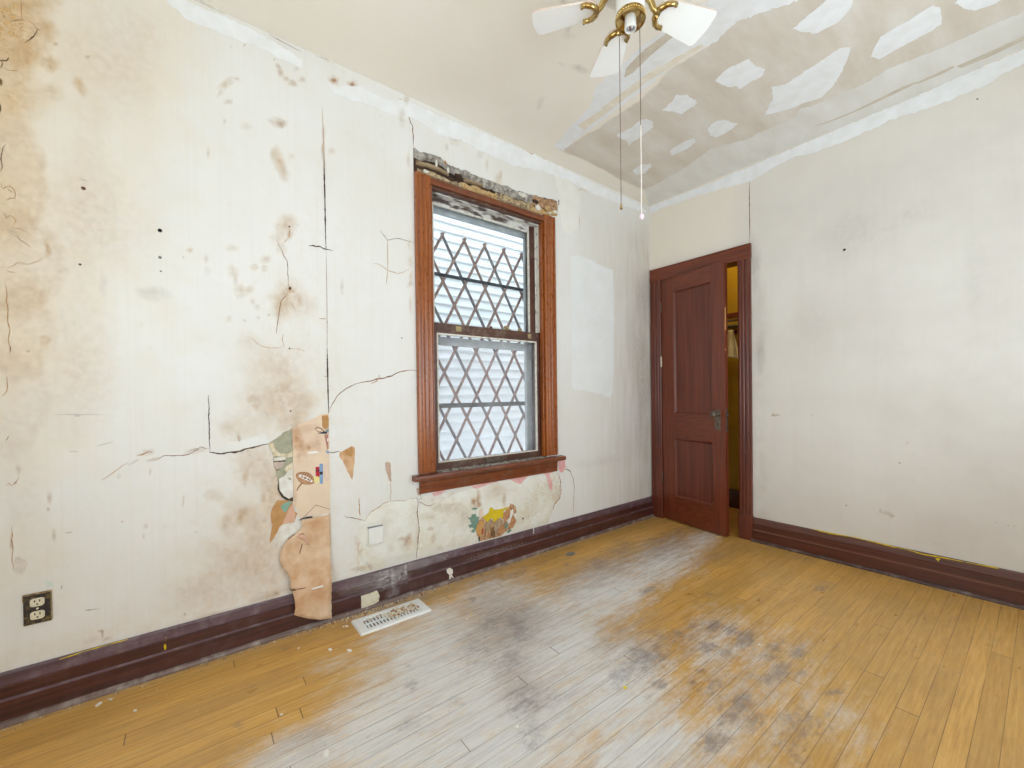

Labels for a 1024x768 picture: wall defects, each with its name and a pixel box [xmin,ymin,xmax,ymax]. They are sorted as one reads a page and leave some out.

crack [251,112,417,413]
crack [102,395,268,480]
peeling [318,415,329,434]
flaking render [268,428,301,548]
peeling [420,491,455,503]
peeling [468,503,517,541]